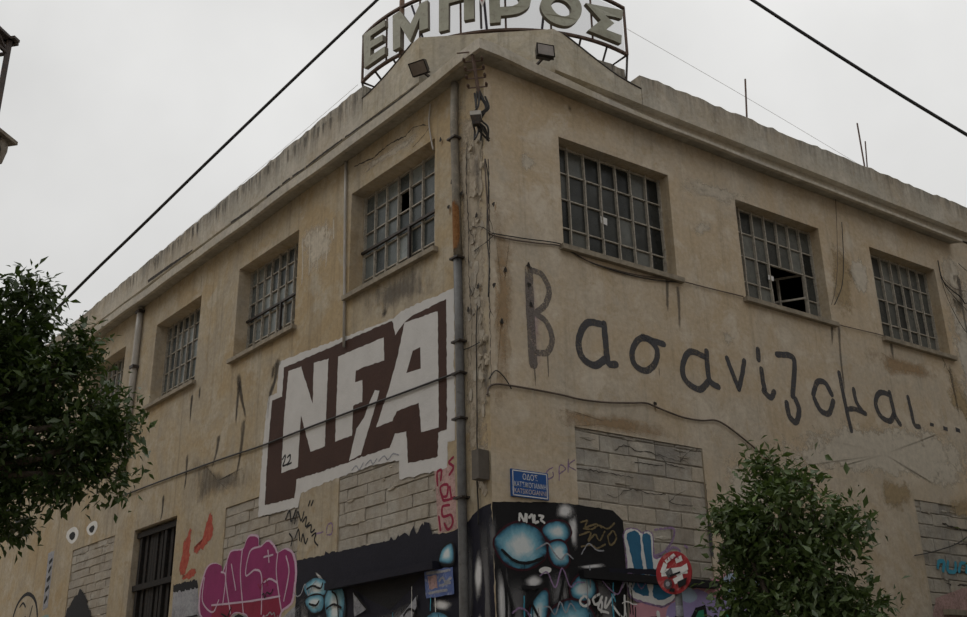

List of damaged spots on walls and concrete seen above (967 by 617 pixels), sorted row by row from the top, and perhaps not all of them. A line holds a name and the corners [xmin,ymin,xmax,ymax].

corrosion [449,194,464,249]